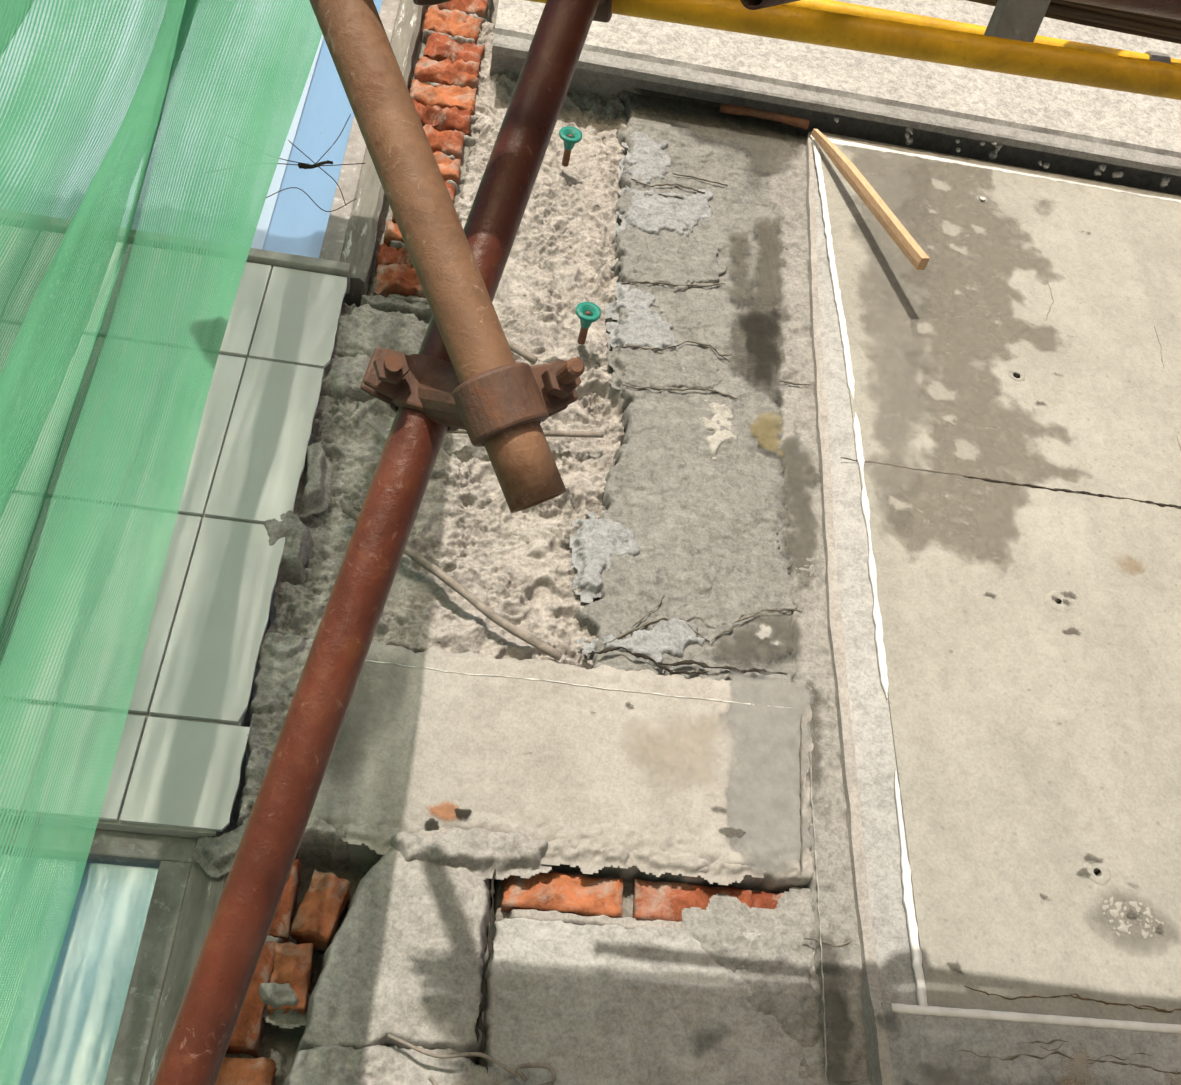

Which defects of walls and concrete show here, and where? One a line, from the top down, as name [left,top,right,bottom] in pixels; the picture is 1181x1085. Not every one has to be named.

flaking render [409,0,518,229]
crack [631,173,728,198]
spalling [367,89,798,673]
crack [619,341,732,362]
damp [730,217,790,453]
damp [853,153,1078,563]
crack [841,457,1181,509]
spalling [192,396,396,878]
flaking render [215,814,403,1085]
flaking render [491,838,783,929]
crack [952,1039,1181,1075]
crack [965,986,1181,1013]